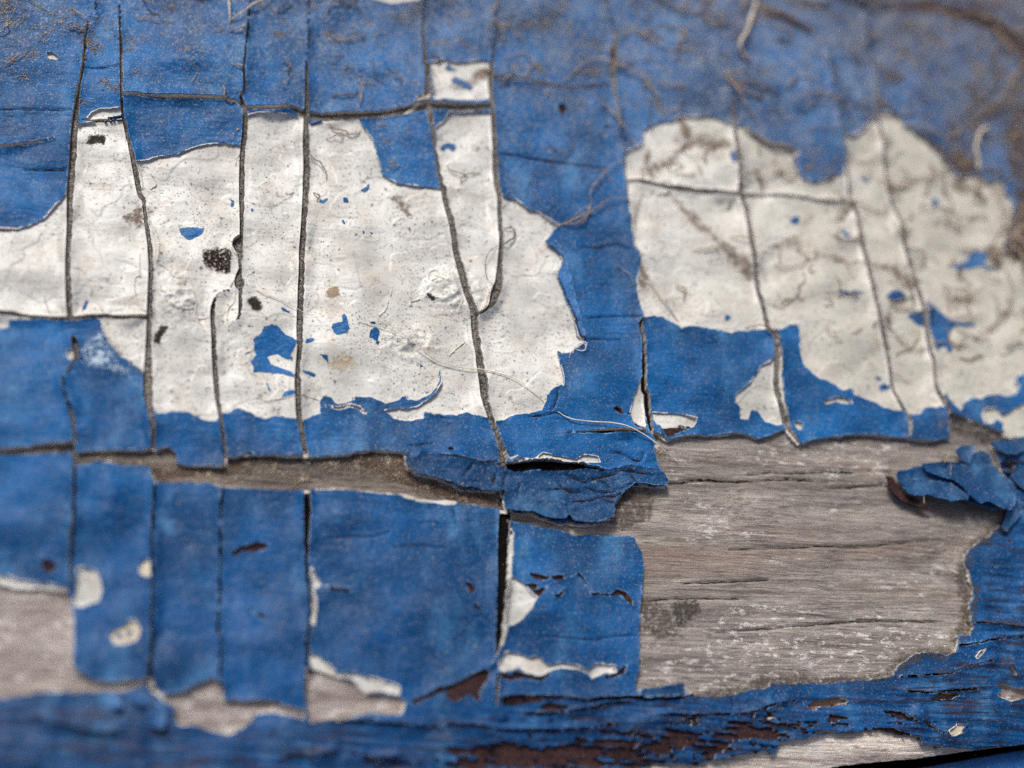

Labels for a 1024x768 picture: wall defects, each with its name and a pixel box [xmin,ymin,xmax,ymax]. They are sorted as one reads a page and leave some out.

peeling [431,60,490,105]
crack [0,7,156,583]
peeling [0,109,1024,701]
crack [210,0,912,732]
crack [876,116,950,440]
crack [146,479,158,689]
peeling [0,568,489,735]
peeling [349,696,1005,768]
crack [901,673,964,694]
crack [954,622,1024,672]